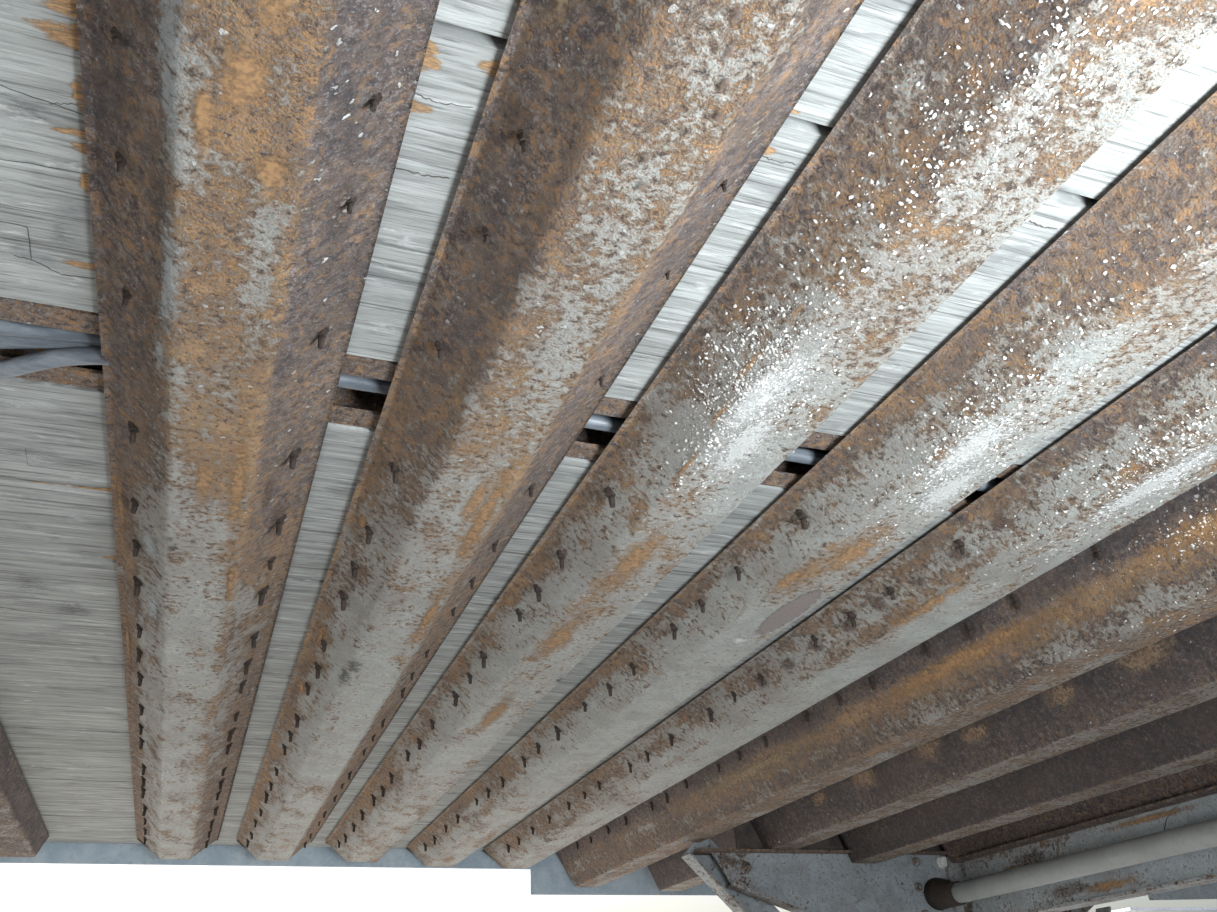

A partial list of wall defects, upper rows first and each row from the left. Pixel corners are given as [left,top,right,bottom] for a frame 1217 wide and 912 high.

rust [26,0,80,52]
rust [421,41,443,71]
rust [195,46,265,154]
rust [411,100,433,113]
rust [52,128,87,154]
rust [258,158,285,199]
rust [456,477,508,555]
rust [1144,513,1217,560]
rust [540,619,581,657]
rust [893,623,1028,700]
rust [478,699,510,730]
rust [1054,877,1135,897]